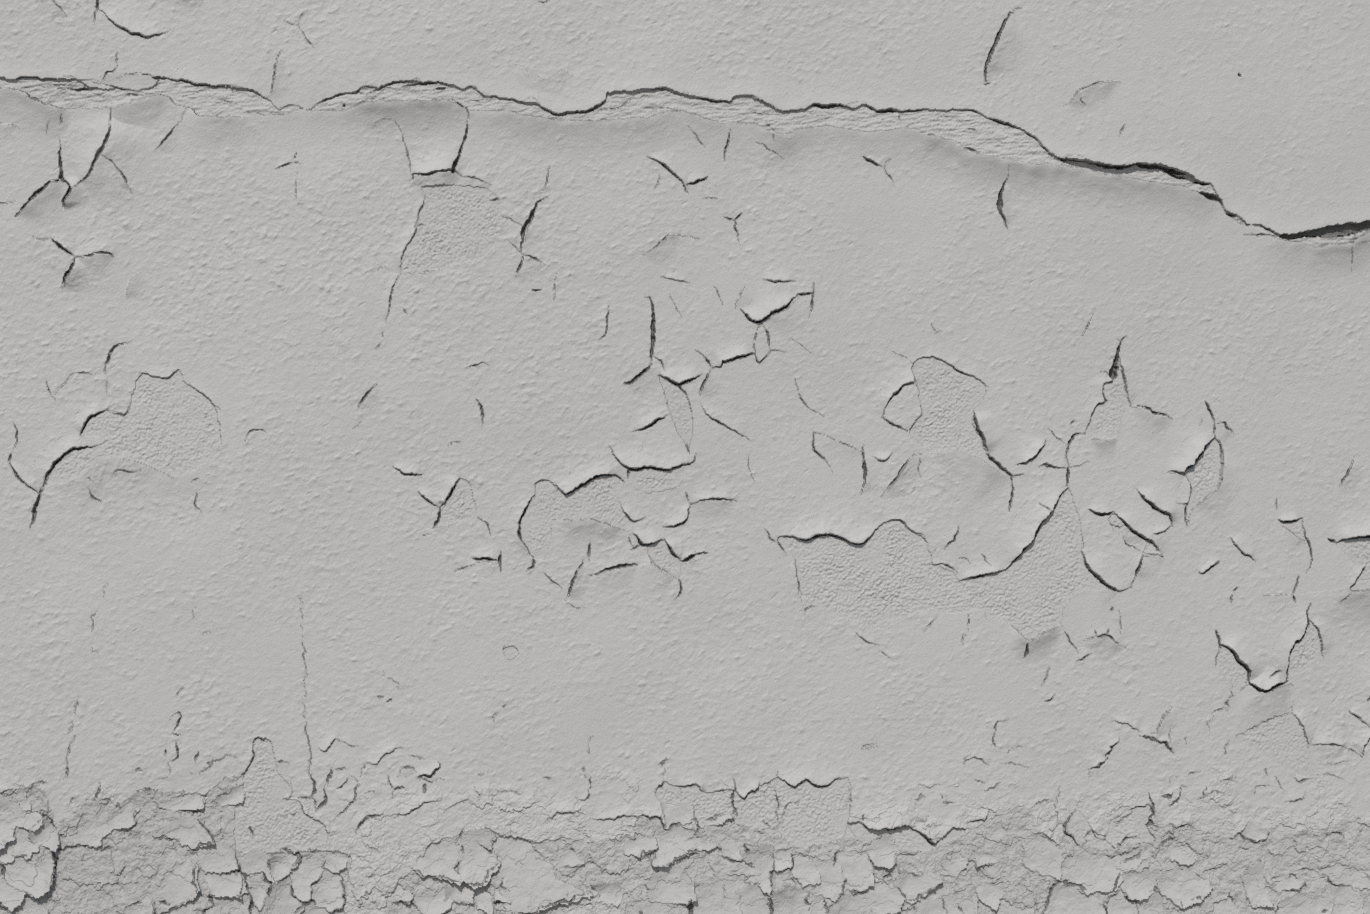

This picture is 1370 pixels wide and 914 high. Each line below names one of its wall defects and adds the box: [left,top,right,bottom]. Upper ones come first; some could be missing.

crack [984,14,1023,76]
crack [275,155,294,170]
peeling [0,59,1370,319]
crack [652,126,784,224]
crack [865,156,889,167]
crack [996,164,1016,225]
peeling [2,367,222,522]
crack [395,464,422,476]
peeling [506,306,753,598]
peeling [765,332,1241,657]
peeling [385,519,1370,914]
peeling [0,729,469,914]